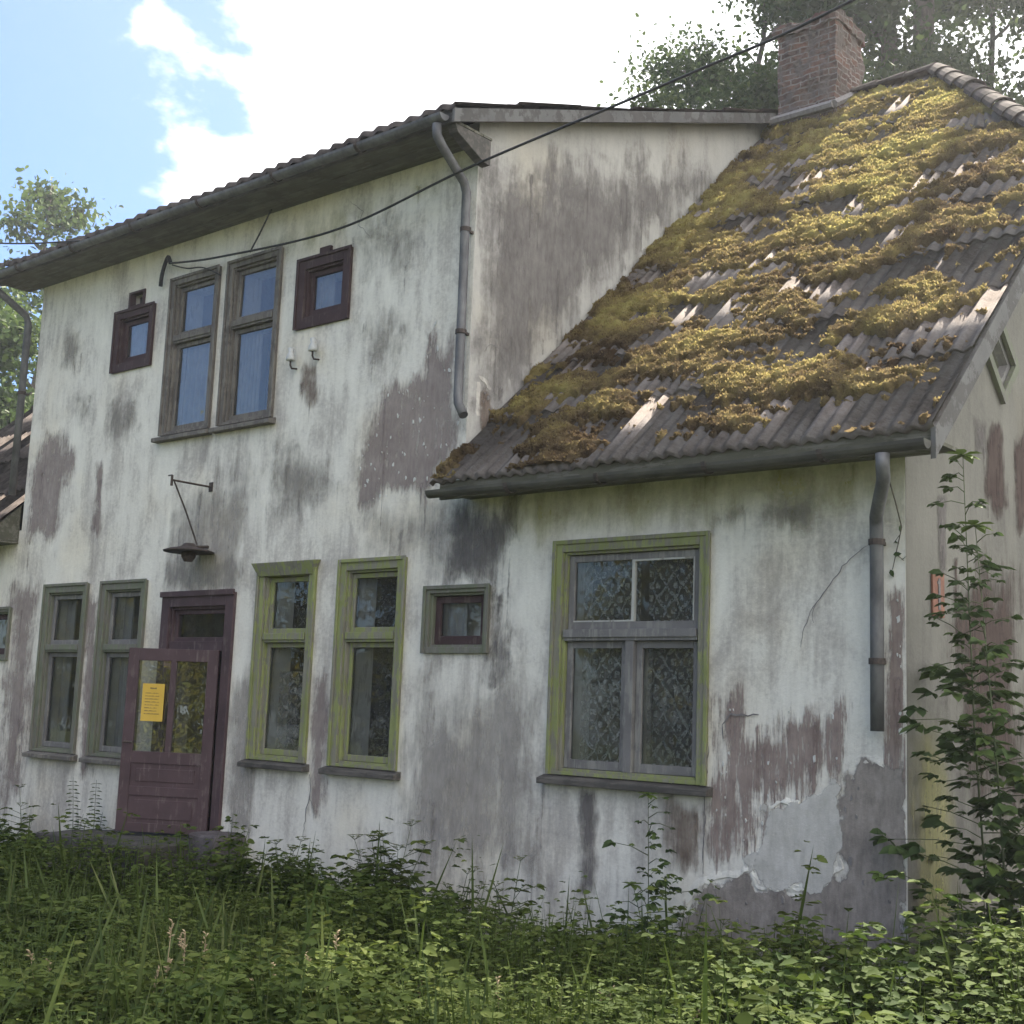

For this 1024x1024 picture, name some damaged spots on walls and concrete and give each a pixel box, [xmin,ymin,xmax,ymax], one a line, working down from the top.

water stain [485,157,710,399]
water stain [27,435,75,540]
water stain [424,496,518,575]
water stain [977,423,1024,535]
crack [801,545,868,642]
spalling [676,586,906,973]